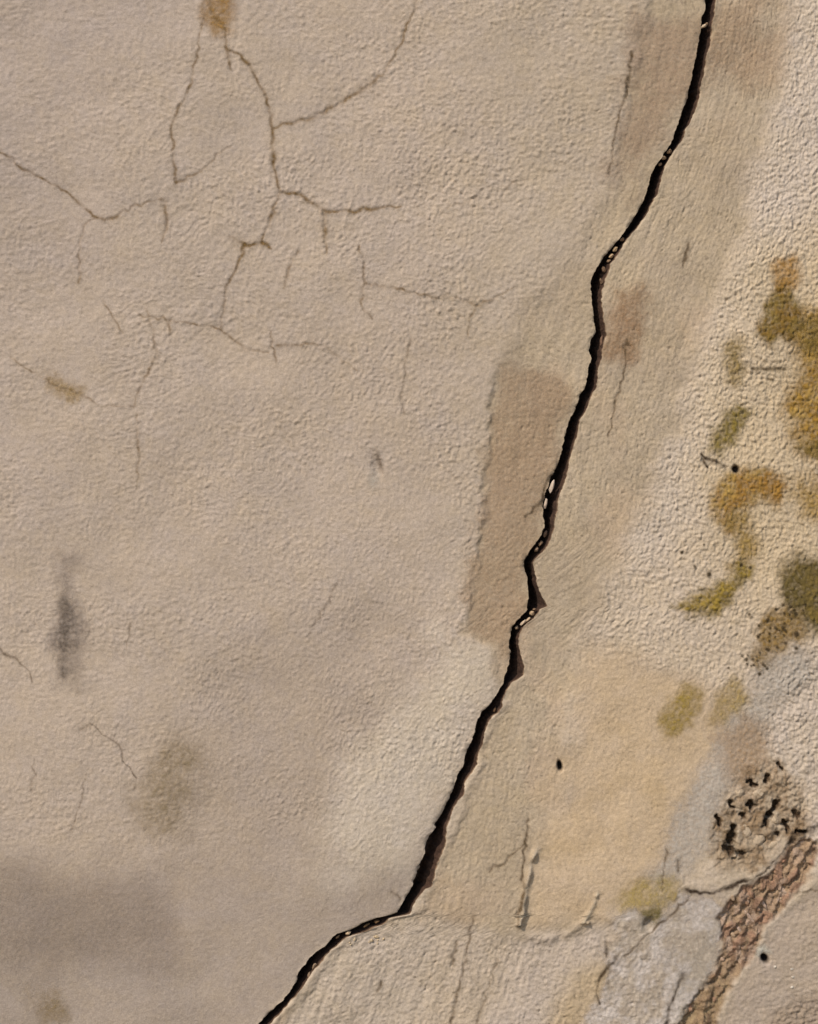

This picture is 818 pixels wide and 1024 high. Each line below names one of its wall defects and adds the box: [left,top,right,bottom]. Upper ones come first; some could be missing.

crack [228,52,401,282]
leakage [714,406,749,449]
leakage [758,258,818,456]
crack [259,0,716,1024]
leakage [680,469,784,615]
flaking render [714,762,806,869]
spalling [757,946,776,968]